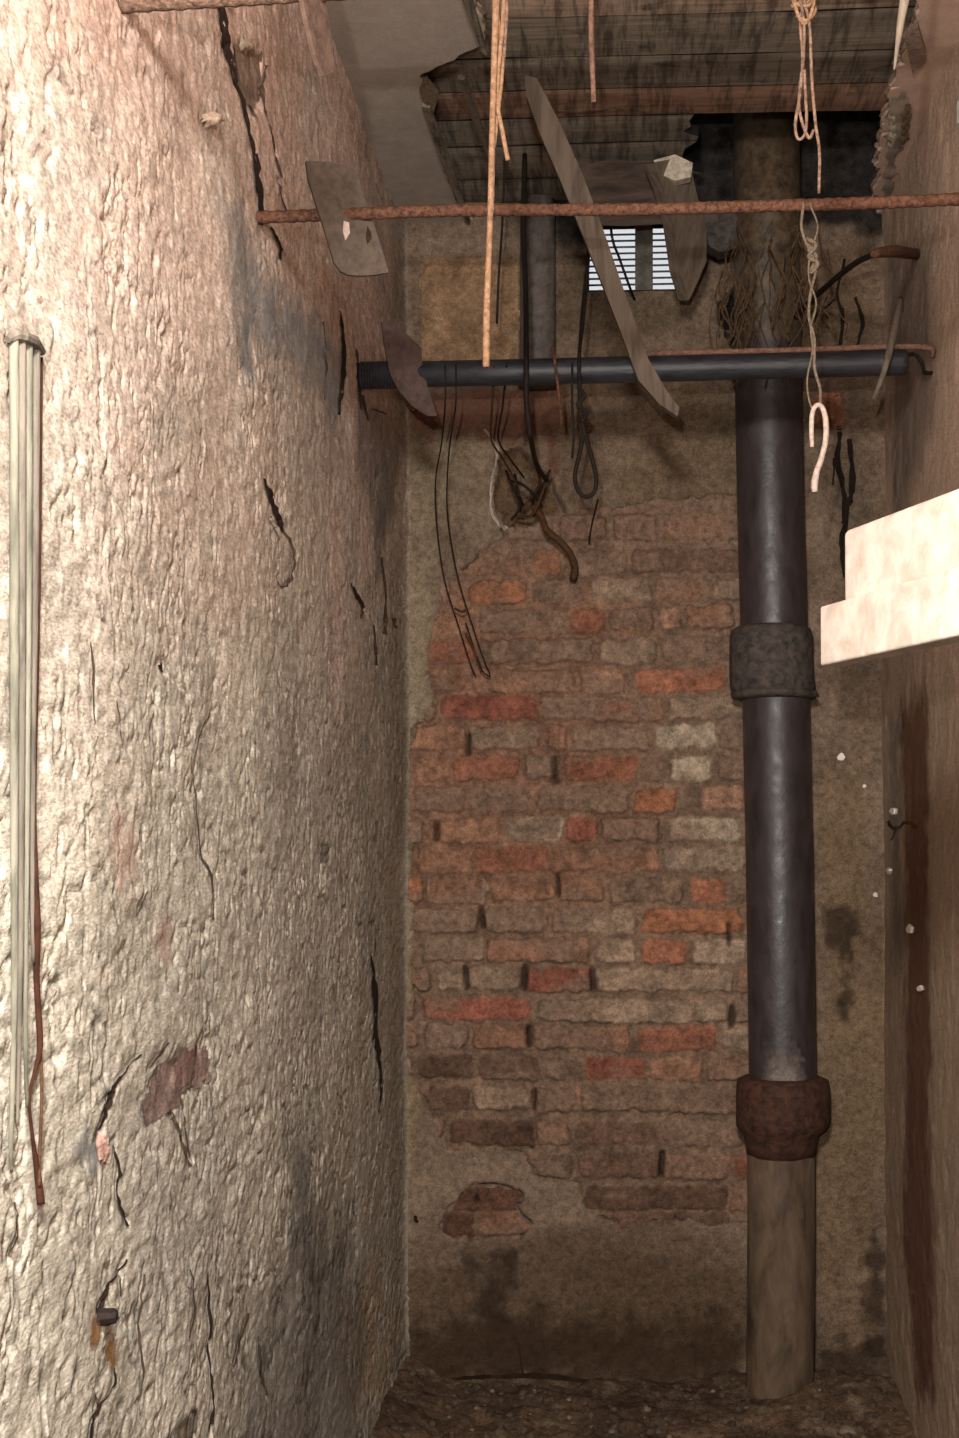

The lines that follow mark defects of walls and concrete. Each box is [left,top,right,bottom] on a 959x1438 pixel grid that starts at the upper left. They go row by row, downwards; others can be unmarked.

spalling [116,0,299,14]
crack [218,7,287,260]
spalling [255,209,320,224]
spalling [341,1,959,220]
crack [263,478,296,588]
flaking render [405,429,749,1229]
crack [89,1042,170,1438]
spalling [141,1045,211,1126]
crack [170,1098,192,1167]
crack [370,929,383,1114]
flaking render [440,1183,531,1241]
crack [189,1269,268,1438]